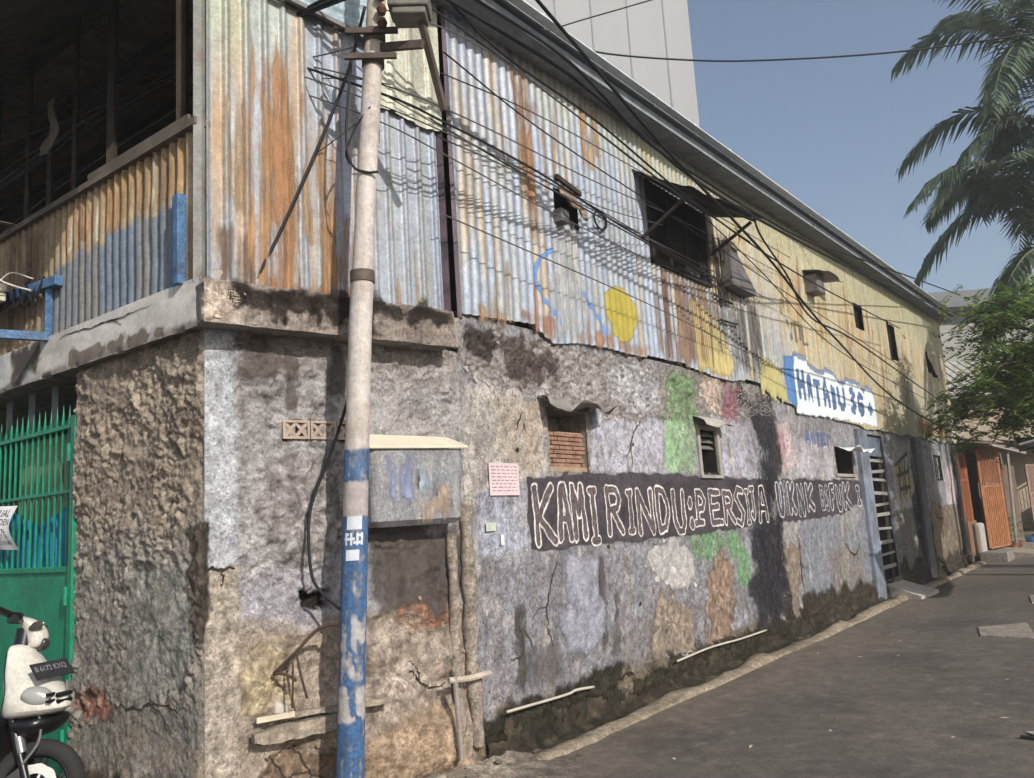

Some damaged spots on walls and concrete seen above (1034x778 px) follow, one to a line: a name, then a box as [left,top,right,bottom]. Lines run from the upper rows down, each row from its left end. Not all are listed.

corrosion [218,42,353,295]
corrosion [509,50,556,237]
corrosion [55,141,186,251]
crack [60,304,151,339]
water stain [227,278,350,329]
water stain [372,290,453,335]
peeling [72,521,214,725]
crack [115,702,181,733]
crack [264,745,324,778]